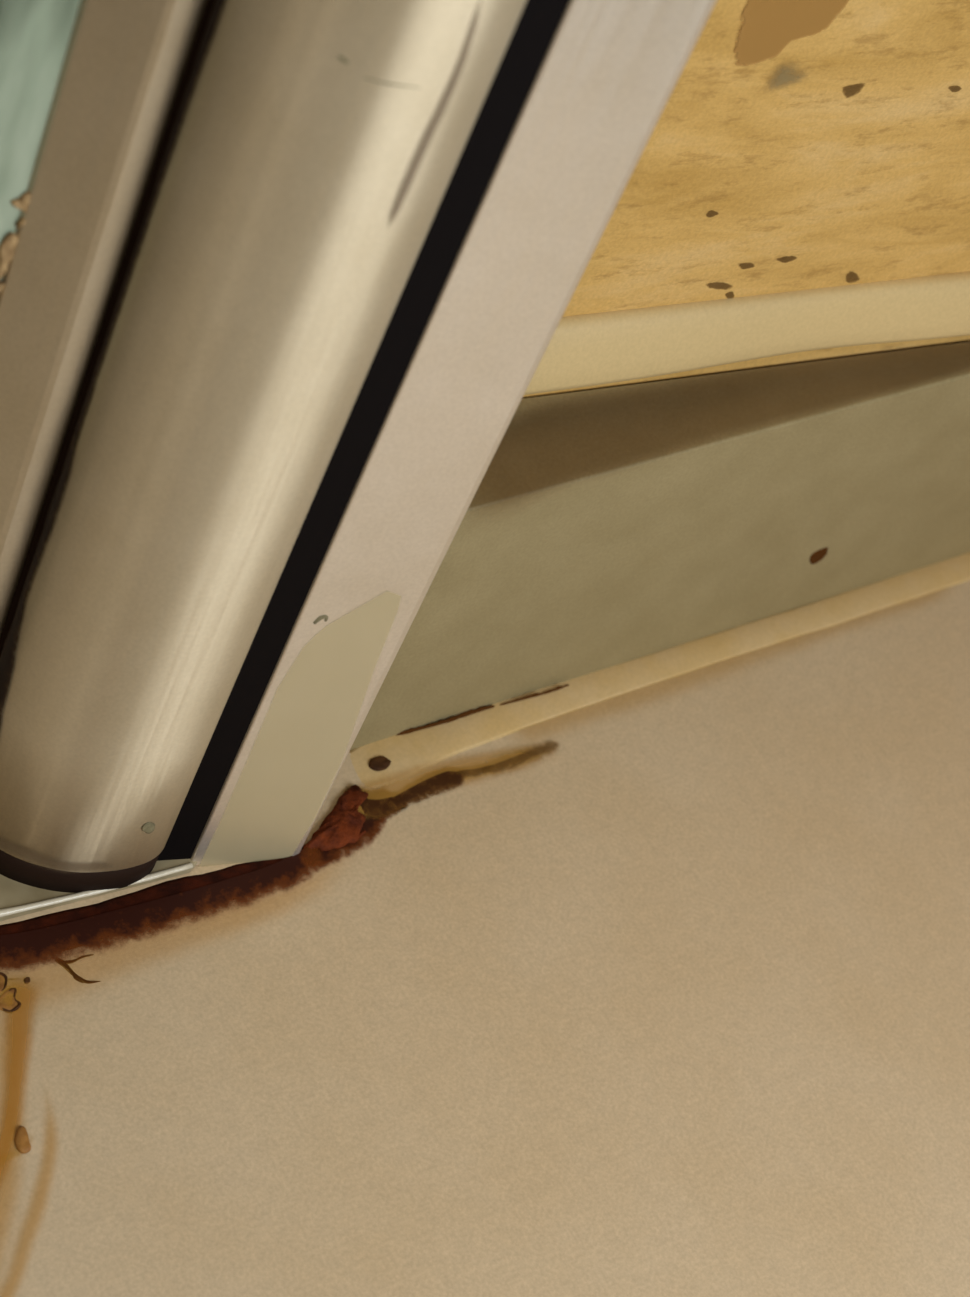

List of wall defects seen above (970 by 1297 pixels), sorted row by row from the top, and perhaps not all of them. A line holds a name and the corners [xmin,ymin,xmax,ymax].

corrosion [0,742,558,970]
corrosion [0,987,31,1176]